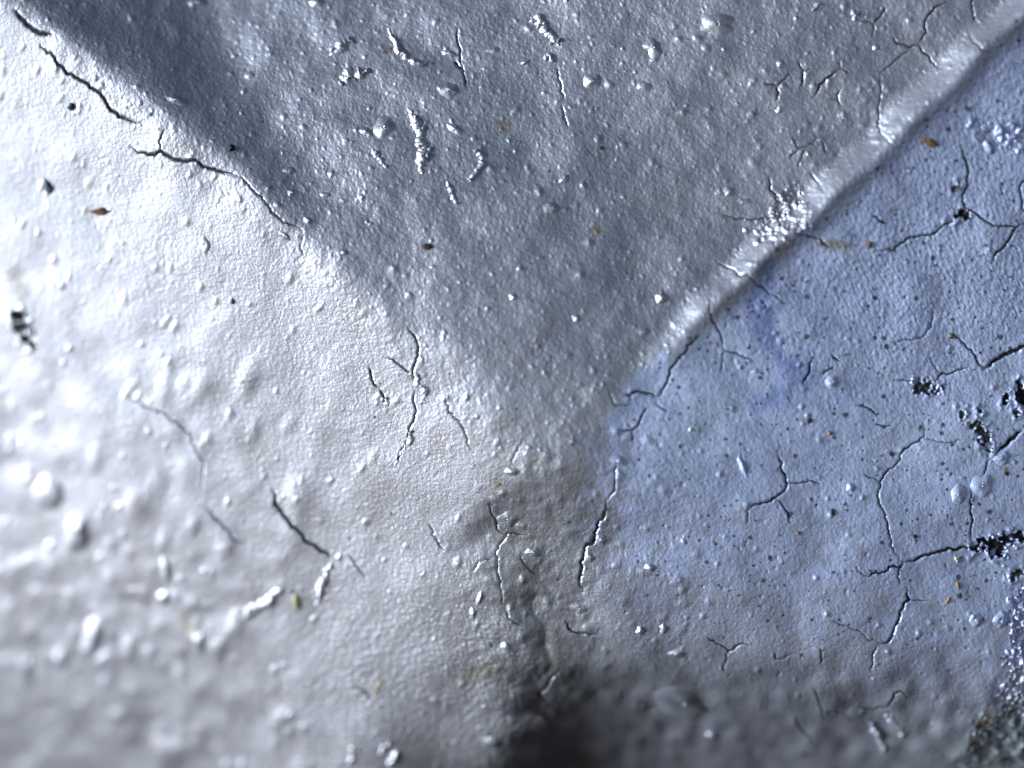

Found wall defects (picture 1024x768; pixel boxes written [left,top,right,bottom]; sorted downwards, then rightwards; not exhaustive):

crack [14,10,304,256]
crack [863,1,946,148]
crack [873,145,1024,262]
crack [368,327,420,466]
crack [608,303,752,441]
spalling [910,377,942,395]
crack [891,304,1024,381]
crack [273,491,364,575]
crack [579,465,617,591]
crack [747,455,819,522]
crack [831,423,1022,674]
spalling [954,531,1024,563]